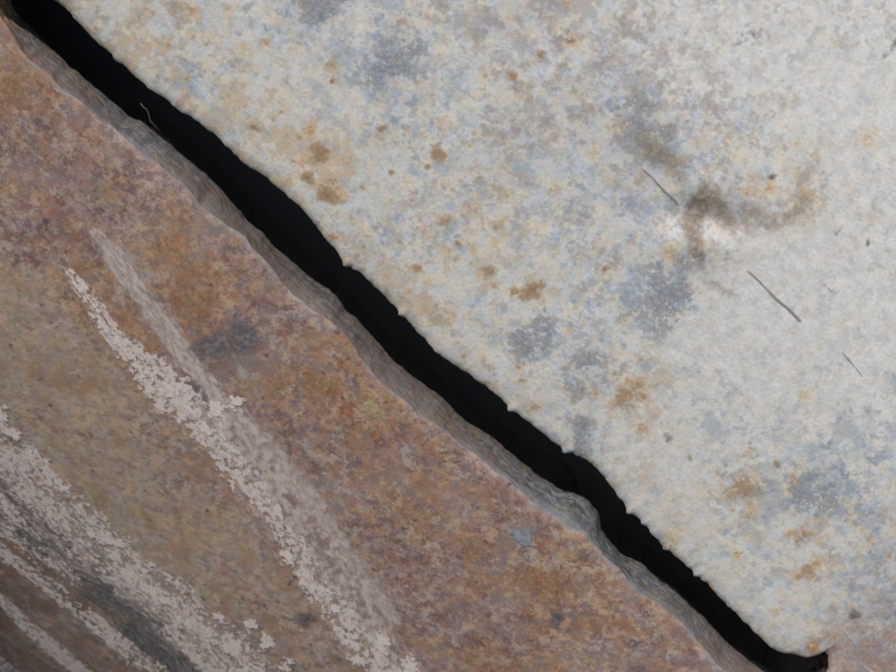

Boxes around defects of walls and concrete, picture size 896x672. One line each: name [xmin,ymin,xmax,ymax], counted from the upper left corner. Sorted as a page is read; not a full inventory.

crack [0,0,19,26]
corrosion [310,143,330,162]
corrosion [426,145,446,169]
corrosion [301,171,340,204]
corrosion [510,281,546,301]
peeling [68,269,246,439]
peeling [278,547,359,620]
peeling [74,527,276,672]
peeling [274,657,295,672]
peeling [374,628,419,672]
crack [807,638,818,655]
crack [805,651,829,672]